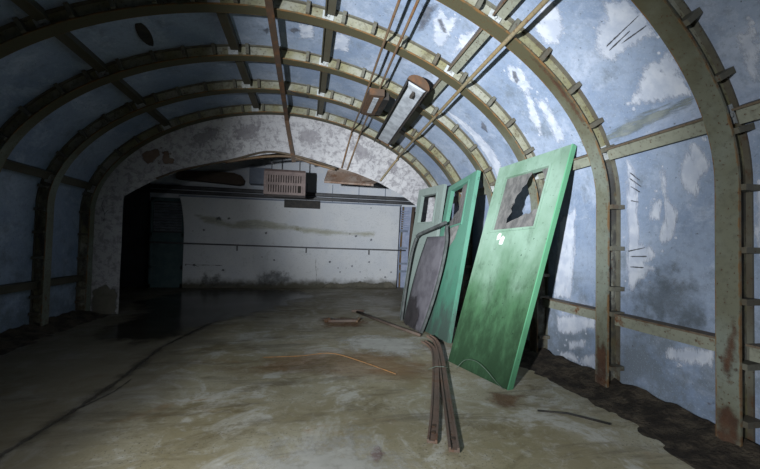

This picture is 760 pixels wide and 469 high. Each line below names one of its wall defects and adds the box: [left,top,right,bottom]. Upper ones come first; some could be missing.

peeling [626,51,691,111]
peeling [680,136,710,206]
rust [596,345,606,387]
peeling [666,347,714,367]
rust [719,327,737,372]
rust [716,407,738,444]